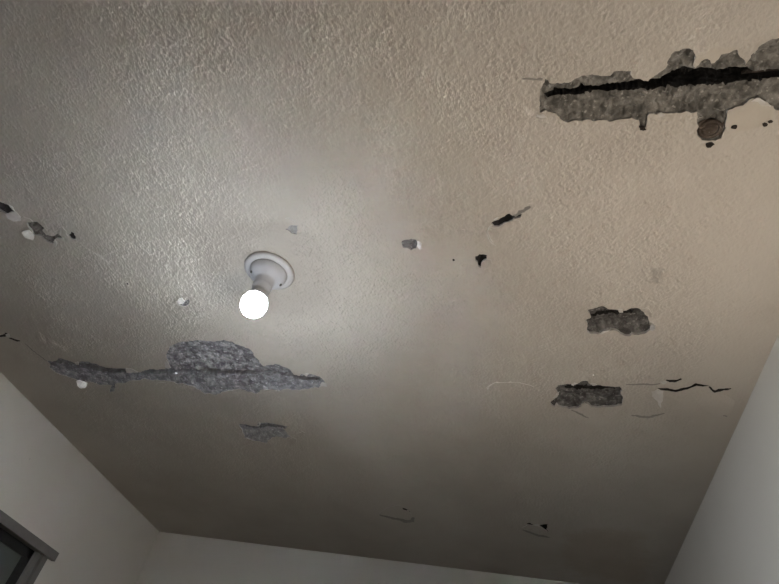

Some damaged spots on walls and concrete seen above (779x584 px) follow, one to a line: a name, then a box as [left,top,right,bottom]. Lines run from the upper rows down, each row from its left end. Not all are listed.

spalling [518,38,779,148]
spalling [0,202,119,269]
spalling [401,239,423,251]
spalling [475,254,492,268]
spalling [492,214,521,225]
spalling [585,306,655,336]
spalling [48,340,327,395]
spalling [550,381,623,418]
crack [626,378,731,419]
spalling [239,422,305,445]